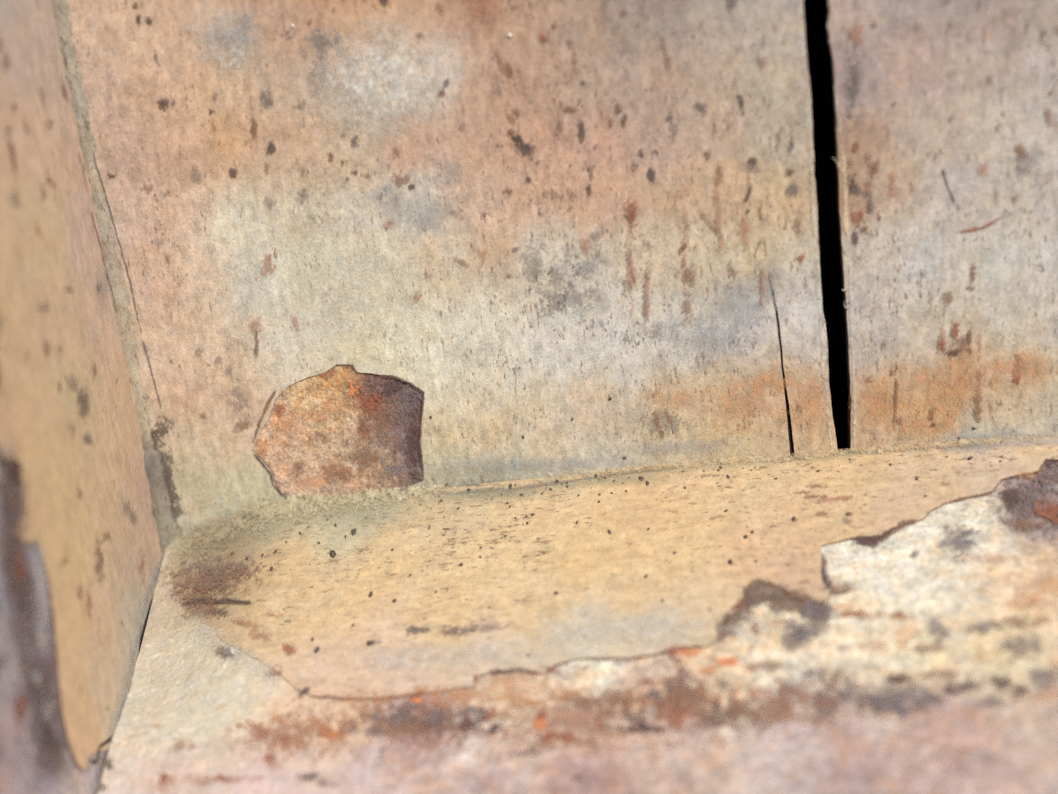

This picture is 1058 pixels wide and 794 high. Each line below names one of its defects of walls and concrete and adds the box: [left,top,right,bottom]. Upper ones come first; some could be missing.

crack [755,208,794,456]
spalling [71,360,97,444]
peeling [234,364,424,499]
rust [310,380,423,484]
rust [852,520,917,548]
rust [950,456,1058,545]
peeling [0,455,1058,794]
rust [716,553,864,653]
rust [298,687,503,745]
rust [473,615,1058,746]
rust [297,771,339,787]